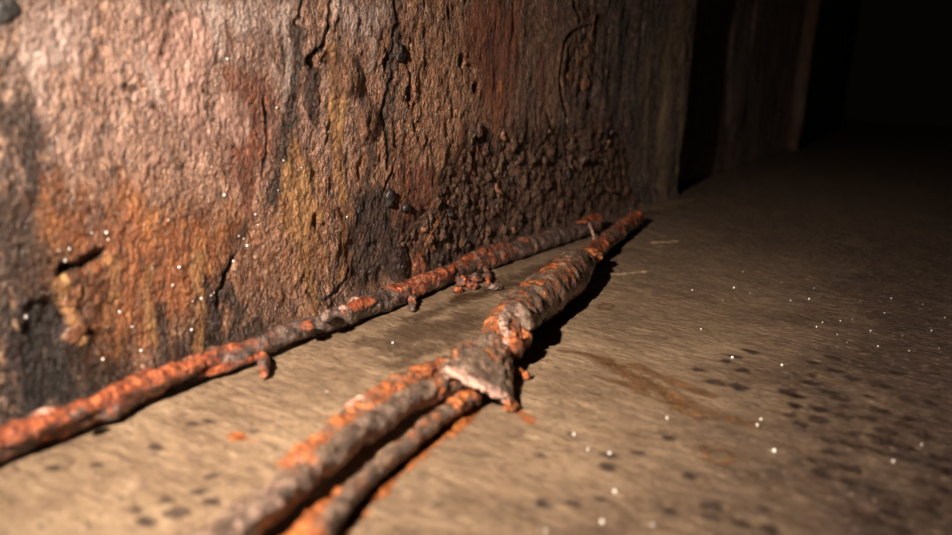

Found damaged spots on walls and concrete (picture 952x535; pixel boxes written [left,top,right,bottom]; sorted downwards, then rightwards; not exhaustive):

crack [380,57,412,199]
corrosion [326,42,350,281]
corrosion [282,137,325,316]
crack [59,250,104,273]
corrosion [0,71,275,449]
crack [216,257,233,299]
corrosion [397,242,512,312]
corrosion [584,248,603,263]
corrosion [343,297,377,316]
corrosion [502,328,533,380]
corrosion [285,487,343,535]